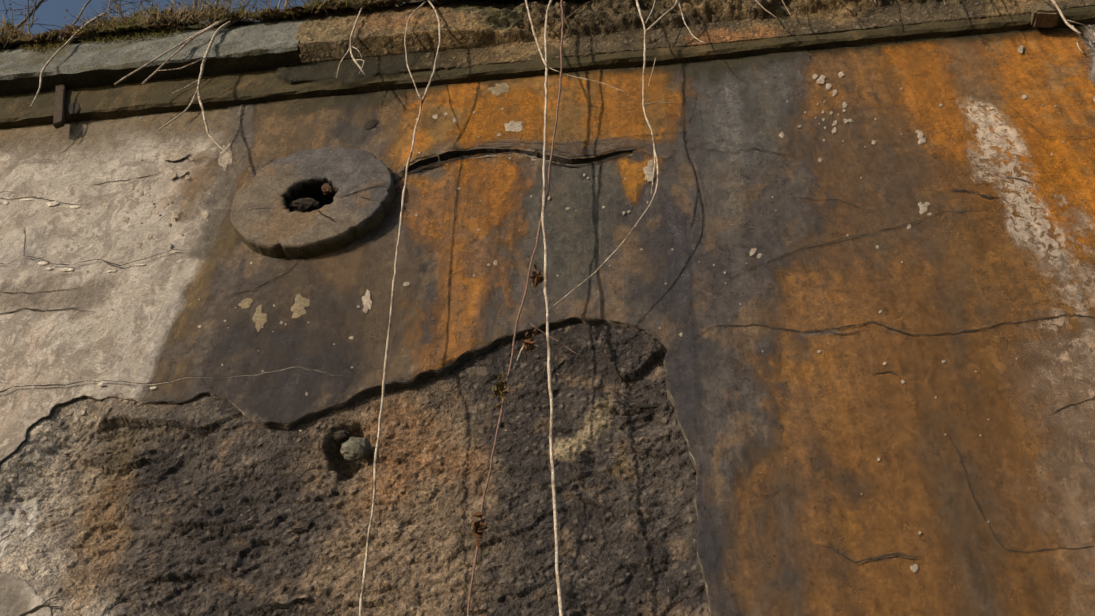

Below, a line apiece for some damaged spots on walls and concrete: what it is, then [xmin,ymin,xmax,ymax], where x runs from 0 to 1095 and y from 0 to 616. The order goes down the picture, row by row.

crack [0,172,163,208]
rust [388,66,682,376]
crack [318,131,795,222]
damp [942,37,1095,406]
crack [0,230,196,314]
damp [0,50,937,616]
crack [690,314,1095,340]
rust [709,27,1095,616]
crack [0,366,350,393]
spalling [0,322,709,616]
crack [19,595,65,616]